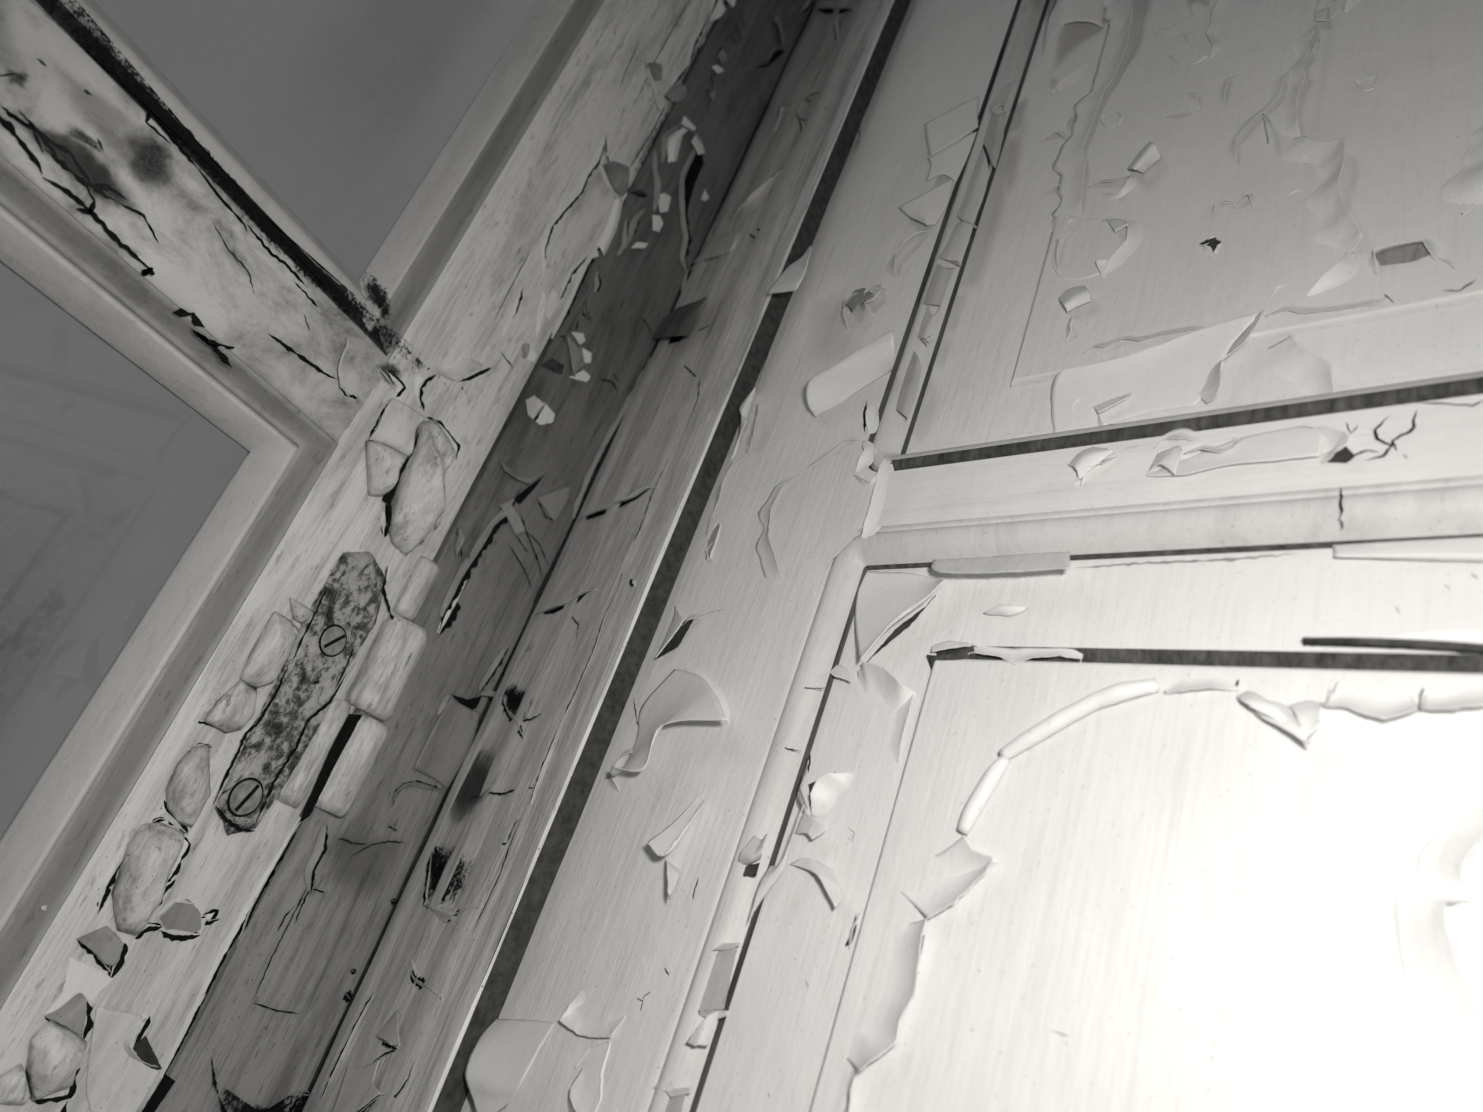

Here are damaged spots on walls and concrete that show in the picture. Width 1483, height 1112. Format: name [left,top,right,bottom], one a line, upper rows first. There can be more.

water stain [10,71,27,85]
crack [0,58,159,276]
crack [83,61,338,380]
water stain [40,0,440,378]
peeling [369,62,710,537]
peeling [1051,238,1475,433]
peeling [1302,637,1483,655]
spalling [301,714,362,821]
peeling [42,878,220,1112]
peeling [465,988,626,1112]
peeling [842,677,1339,1112]
peeling [1393,803,1483,1036]